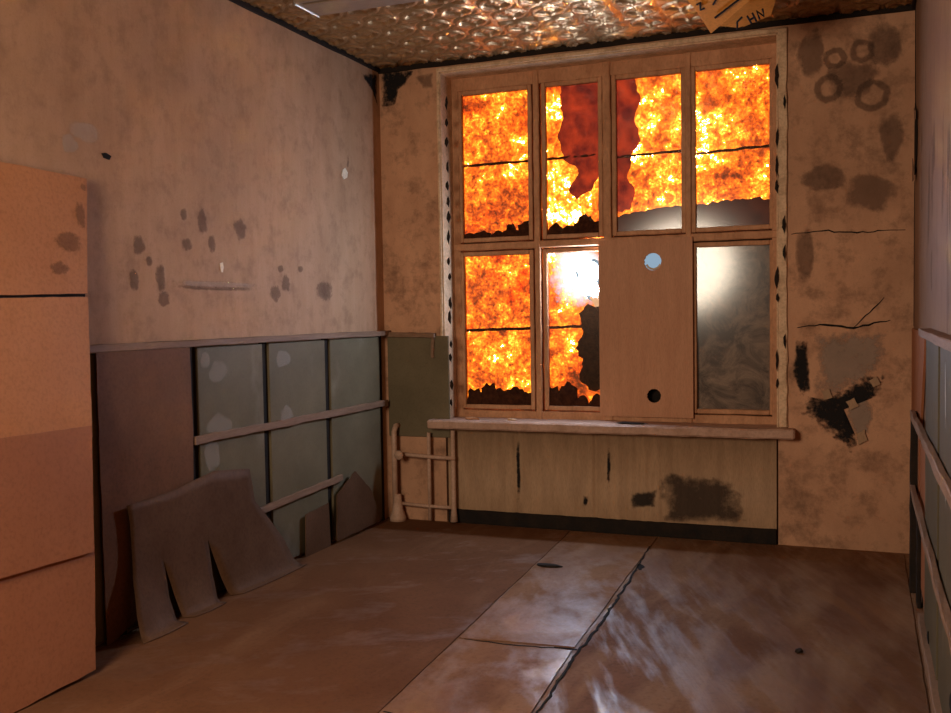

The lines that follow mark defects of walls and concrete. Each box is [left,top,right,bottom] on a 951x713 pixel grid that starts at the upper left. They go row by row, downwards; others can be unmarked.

crack [467,546,650,713]